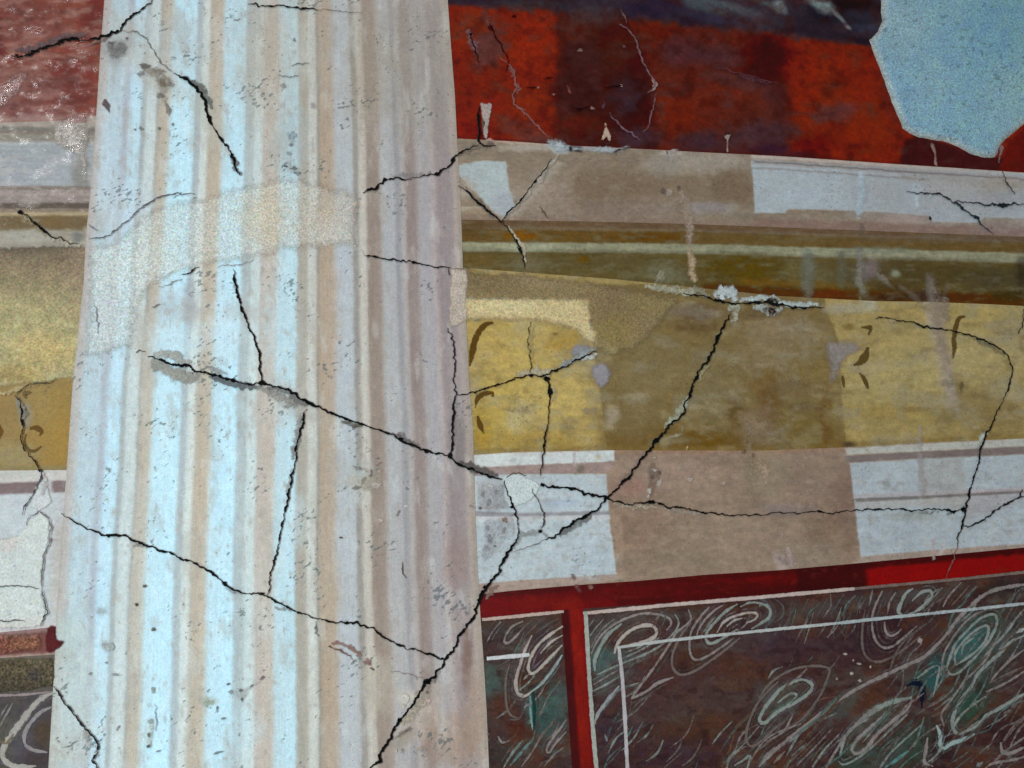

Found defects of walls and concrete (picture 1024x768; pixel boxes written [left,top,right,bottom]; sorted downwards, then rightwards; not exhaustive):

crack [17,192,194,247]
crack [10,0,242,175]
crack [354,245,471,275]
crack [363,11,658,267]
crack [907,171,1023,234]
crack [0,260,1024,768]